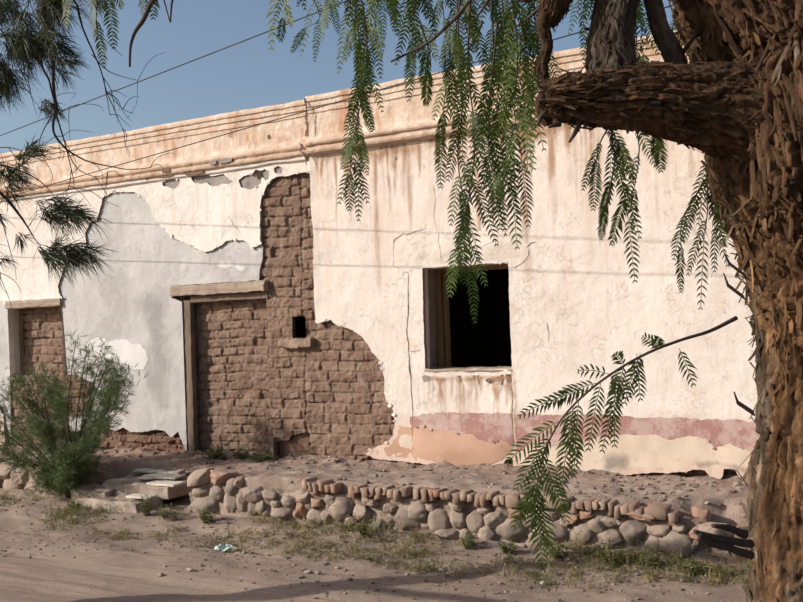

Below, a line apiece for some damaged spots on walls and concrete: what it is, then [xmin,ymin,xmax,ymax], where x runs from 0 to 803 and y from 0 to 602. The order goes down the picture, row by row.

peeling [0,301,13,443]
peeling [59,158,478,461]
crack [393,148,507,442]
peeling [491,434,751,474]